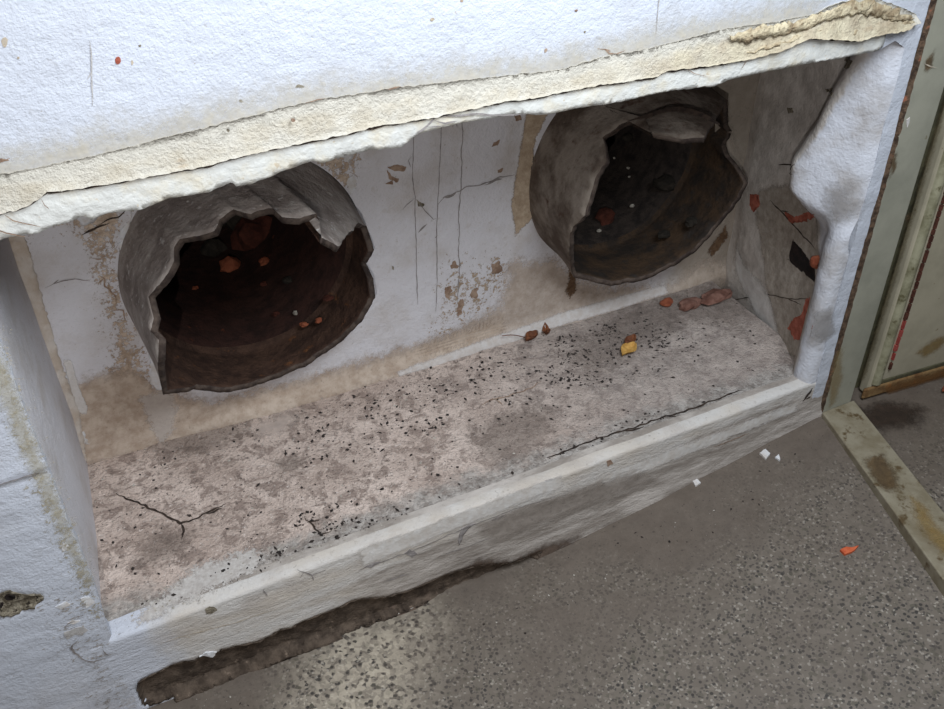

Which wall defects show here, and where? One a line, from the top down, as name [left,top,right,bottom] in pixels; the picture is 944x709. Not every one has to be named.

spalling [0,34,886,391]
rust [709,225,728,256]
crack [547,390,740,458]
crack [116,493,224,539]
spalling [0,329,547,709]